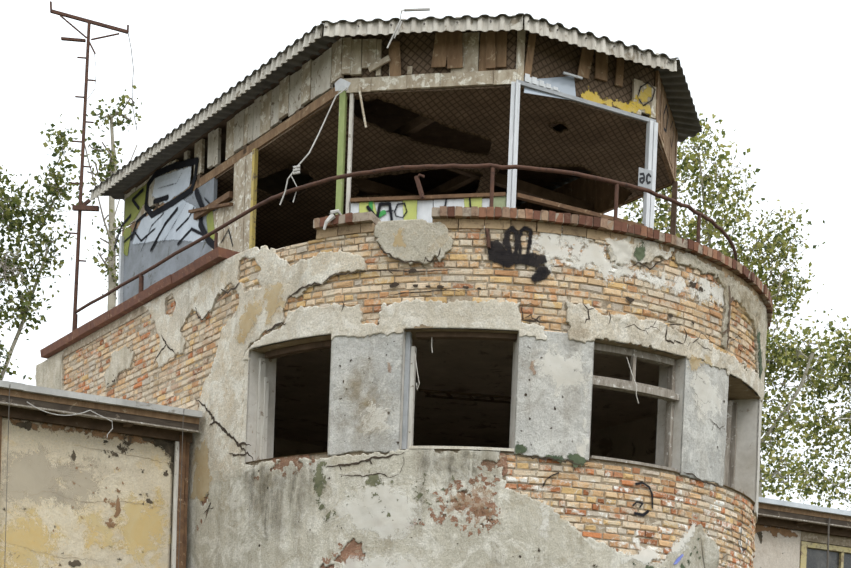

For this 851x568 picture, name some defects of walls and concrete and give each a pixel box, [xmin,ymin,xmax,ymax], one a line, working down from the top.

crack [290,245,463,297]
spalling [252,229,763,378]
spalling [63,258,262,410]
peeling [101,434,153,458]
crack [196,400,254,462]
crack [327,453,404,478]
spalling [96,479,124,529]
spalling [405,442,798,568]
spalling [321,538,368,568]